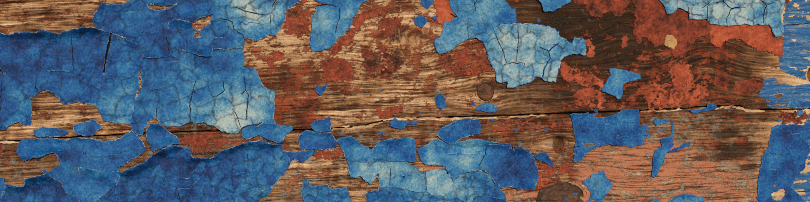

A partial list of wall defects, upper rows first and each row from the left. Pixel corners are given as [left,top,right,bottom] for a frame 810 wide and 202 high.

crack [103,33,112,73]
crack [220,0,428,58]
peeling [414,0,595,88]
crack [494,31,556,75]
crack [687,0,739,26]
crack [189,78,249,127]
peeling [0,0,553,202]
peeling [599,68,641,99]
peeling [660,0,810,202]
peeling [544,109,690,178]
peeling [583,170,613,202]